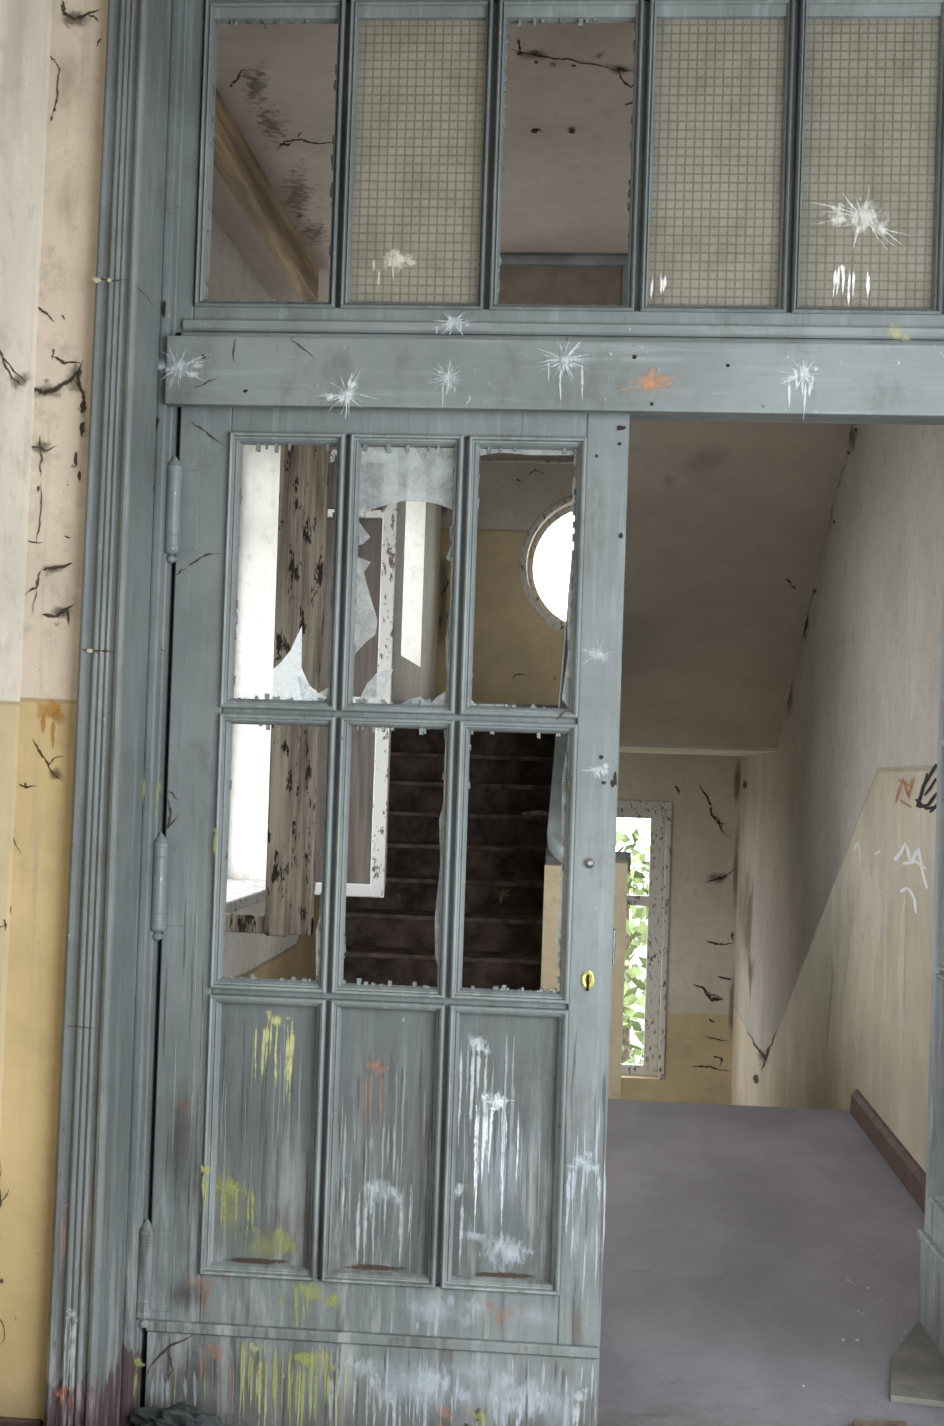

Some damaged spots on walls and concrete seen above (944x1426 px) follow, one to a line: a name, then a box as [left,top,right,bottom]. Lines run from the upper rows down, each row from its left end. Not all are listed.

crack [512,39,634,105]
crack [0,307,87,417]
crack [26,438,115,653]
crack [675,783,735,882]